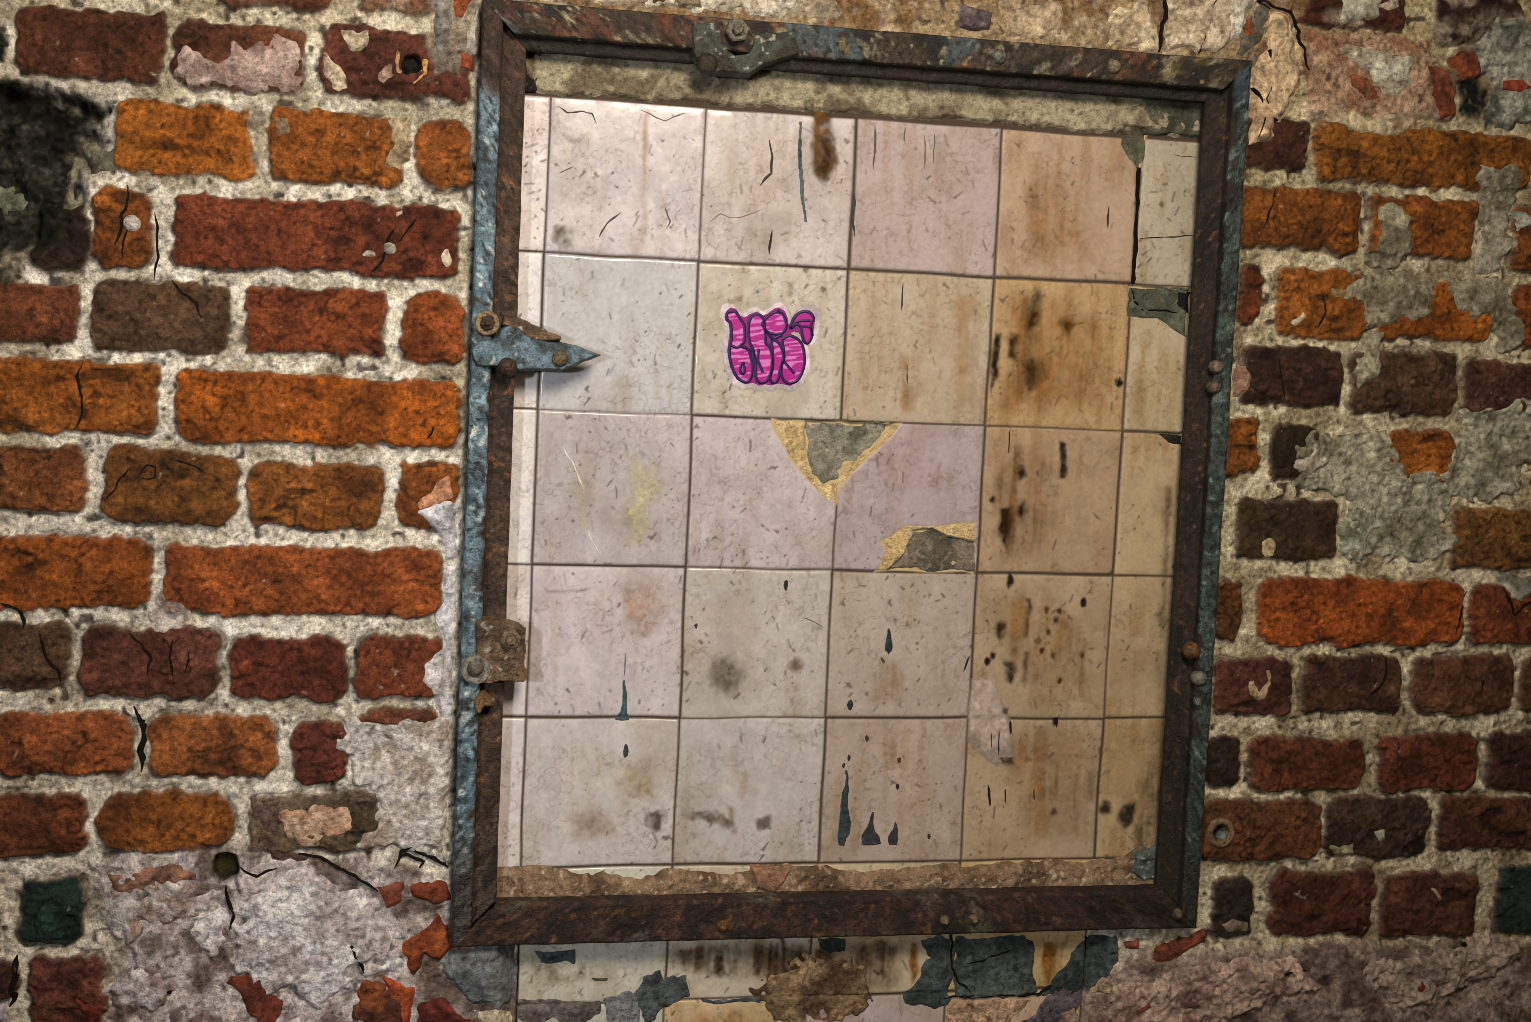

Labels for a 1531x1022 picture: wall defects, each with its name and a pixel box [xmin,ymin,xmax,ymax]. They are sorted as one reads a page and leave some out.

flaking render [1106,0,1270,56]
corrosion [812,111,838,180]
leakage [0,80,104,285]
flaking render [1293,397,1531,565]
corrosion [696,810,732,827]
corrosion [757,816,770,828]
crack [224,847,448,931]
flaking render [250,715,873,1022]
crack [8,955,20,1007]
spalling [226,973,283,1022]
crack [350,945,364,974]
flaking render [902,919,1322,1022]